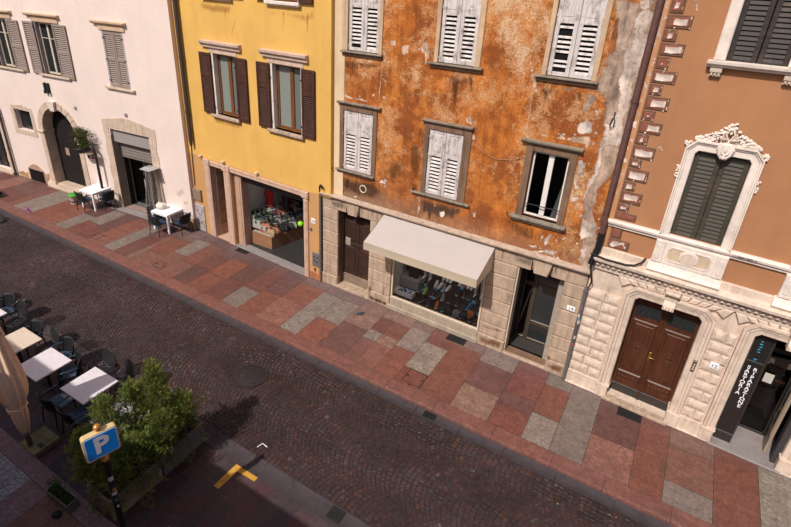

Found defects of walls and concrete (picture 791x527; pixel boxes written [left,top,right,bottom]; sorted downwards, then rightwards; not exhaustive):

peeling [382,34,430,63]
peeling [557,0,698,268]
peeling [529,234,566,260]